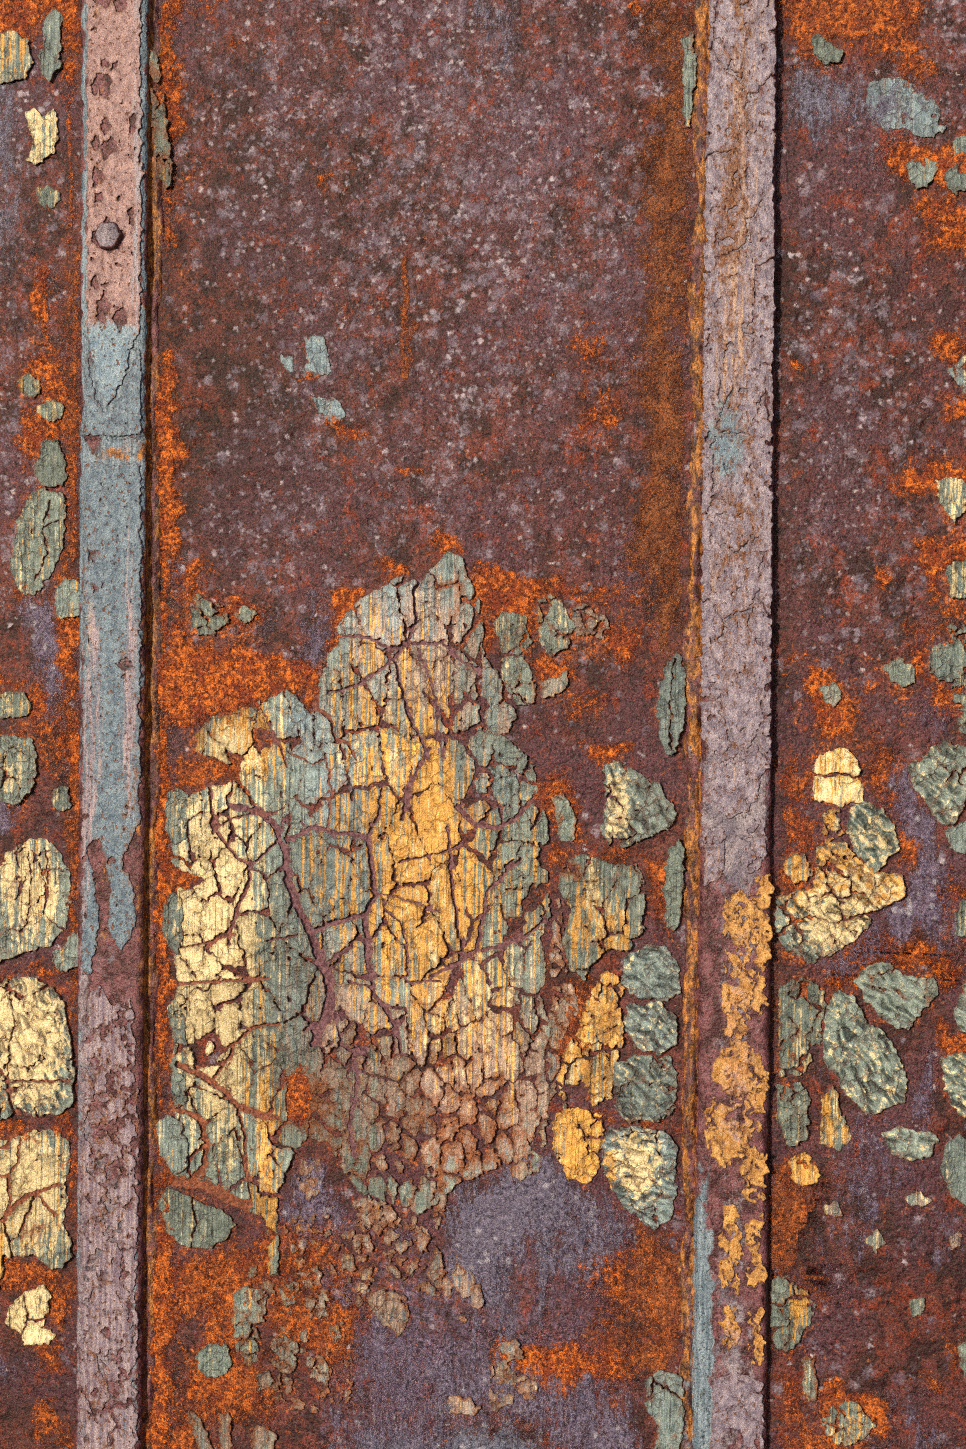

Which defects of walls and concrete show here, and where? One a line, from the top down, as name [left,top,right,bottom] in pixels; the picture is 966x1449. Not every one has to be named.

rust [0,0,81,585]
peeling [83,0,175,436]
rust [426,0,693,721]
rust [778,0,940,86]
crack [0,977,70,1260]
peeling [0,439,143,1449]
rust [146,348,369,1449]
crack [169,577,551,1213]
peeling [156,551,685,1416]
rust [490,1224,681,1419]
peeling [655,0,938,1449]
peeling [881,624,966,854]